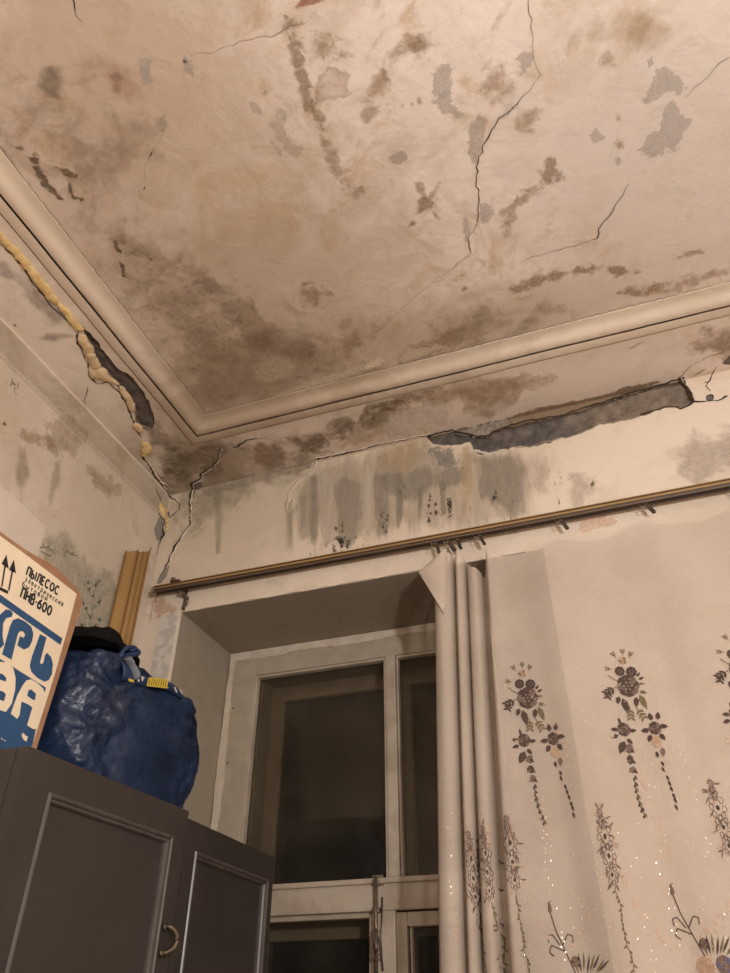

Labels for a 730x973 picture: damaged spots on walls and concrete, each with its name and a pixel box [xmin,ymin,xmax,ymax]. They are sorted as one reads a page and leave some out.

crack [191,21,308,56]
peeling [432,64,463,117]
peeling [638,56,691,158]
leakage [29,157,84,201]
crack [370,0,542,340]
crack [0,147,730,414]
spalling [83,326,155,430]
crack [0,231,431,623]
leakage [293,398,450,474]
spalling [427,377,694,455]
leakage [310,477,364,554]
leakage [375,446,464,533]